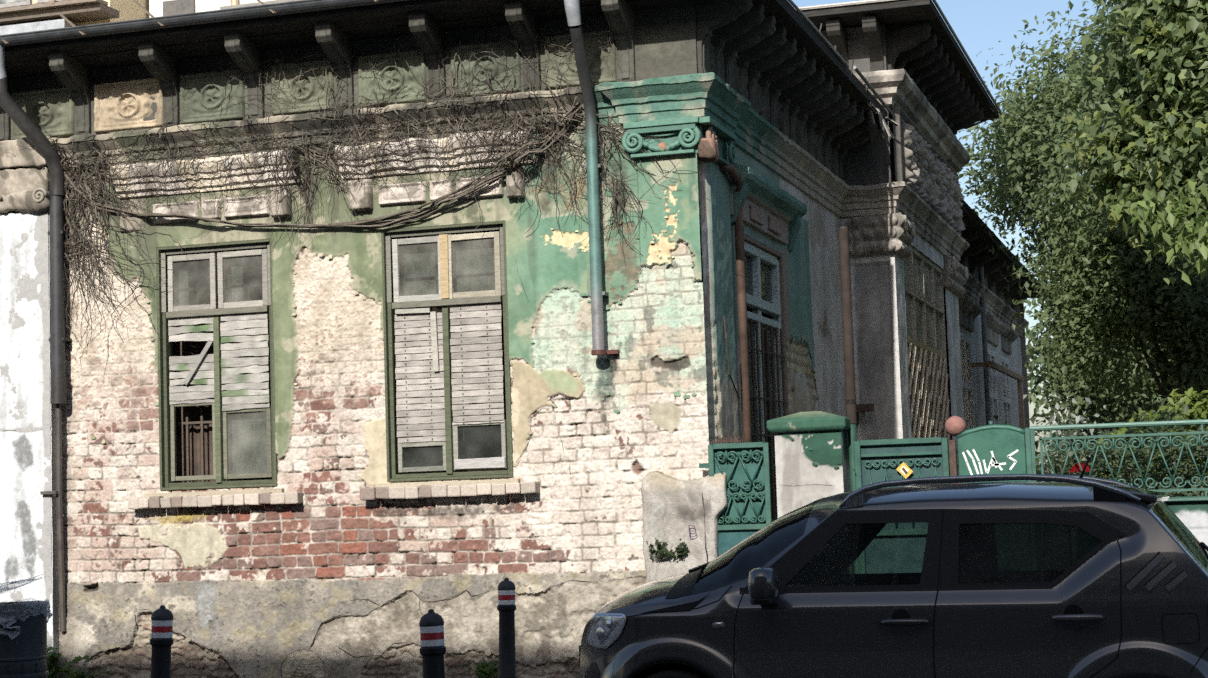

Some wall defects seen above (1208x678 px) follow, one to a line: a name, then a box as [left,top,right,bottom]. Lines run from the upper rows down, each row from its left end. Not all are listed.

peeling [62,220,159,455]
peeling [280,251,386,469]
peeling [526,168,723,445]
peeling [774,433,855,518]
flaking render [58,612,153,678]
flaking render [171,632,244,678]
flaking render [184,486,573,678]
crack [280,590,490,678]
flaking render [515,576,646,678]